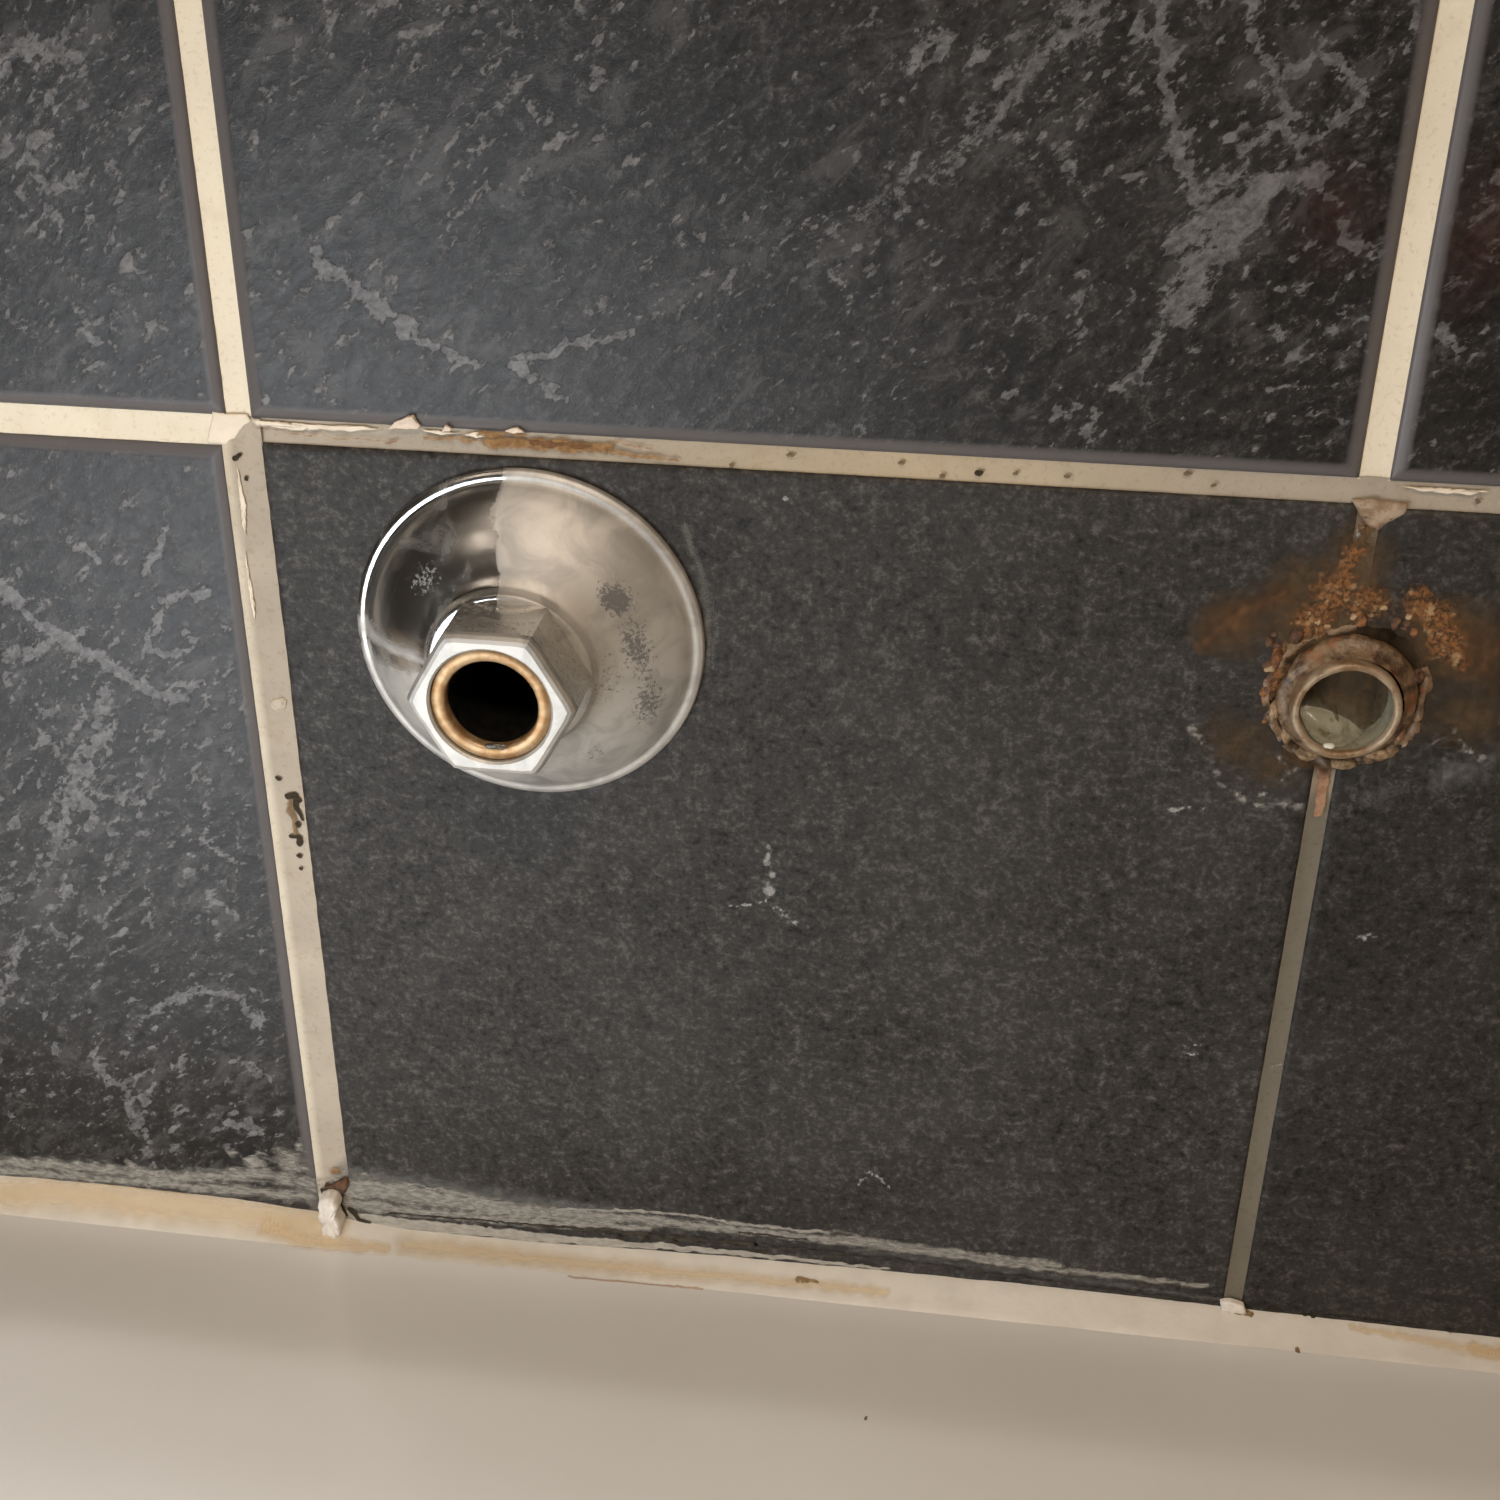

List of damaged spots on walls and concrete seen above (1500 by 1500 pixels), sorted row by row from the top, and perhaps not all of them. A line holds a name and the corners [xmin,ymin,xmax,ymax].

rust [424,431,679,461]
rust [1196,522,1500,817]